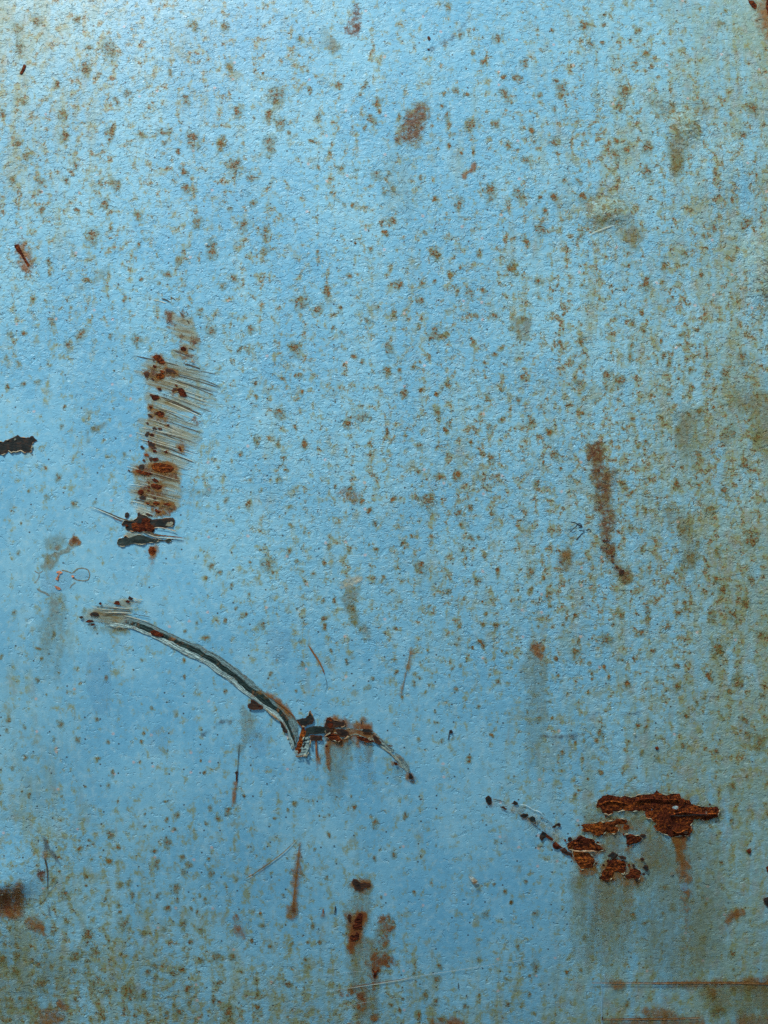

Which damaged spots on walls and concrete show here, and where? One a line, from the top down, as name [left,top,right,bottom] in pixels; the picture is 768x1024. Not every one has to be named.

peeling [0,435,37,455]
rust [133,308,214,516]
rust [586,441,634,583]
spalling [79,596,413,779]
rust [315,741,330,770]
rust [0,883,68,936]
rust [283,849,316,919]
rust [351,878,382,898]
rust [553,790,733,929]
rust [339,911,480,1024]